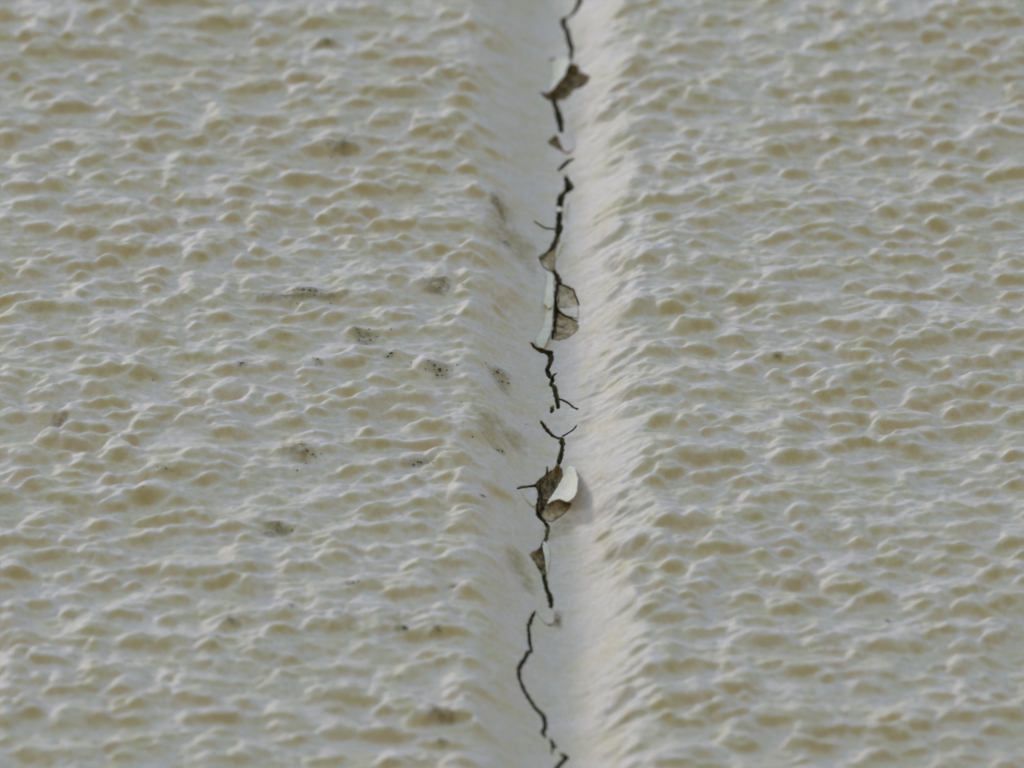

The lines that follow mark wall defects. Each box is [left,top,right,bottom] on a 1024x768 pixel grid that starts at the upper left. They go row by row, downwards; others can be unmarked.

crack [560,0,582,61]
peeling [539,57,590,106]
crack [552,98,564,133]
peeling [535,237,579,348]
crack [517,158,579,542]
peeling [522,464,579,522]
crack [517,574,568,768]